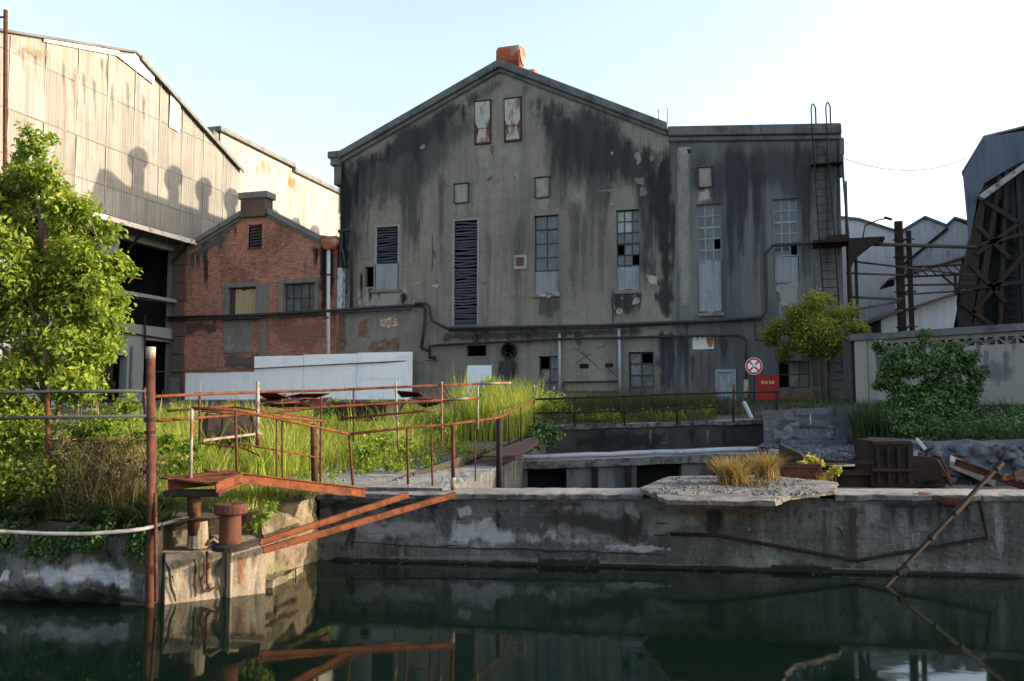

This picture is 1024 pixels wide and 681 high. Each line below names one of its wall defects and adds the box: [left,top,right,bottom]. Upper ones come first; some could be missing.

leakage [313,94,478,309]
leakage [537,98,710,317]
leakage [191,222,238,284]
peeling [338,282,441,352]
leakage [321,502,438,549]
leakage [391,506,723,566]